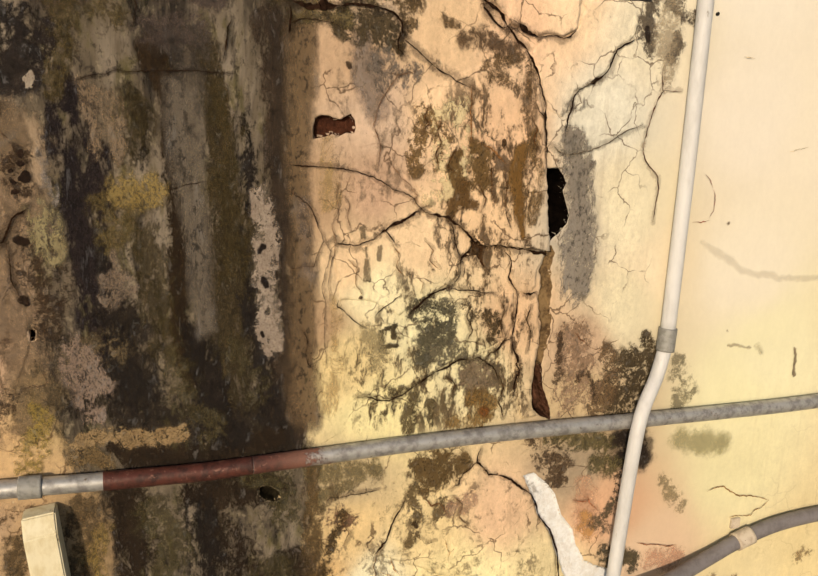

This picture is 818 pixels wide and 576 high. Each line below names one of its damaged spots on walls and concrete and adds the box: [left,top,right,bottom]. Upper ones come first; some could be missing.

flaking render [22,70,34,88]
spalling [313,114,356,139]
crack [483,0,680,218]
leakage [0,0,426,474]
crack [289,0,551,416]
flaking render [408,168,569,419]
spalling [58,333,190,471]
leakage [552,321,657,417]
leakage [61,458,383,576]
crack [373,449,559,576]
leakage [524,429,630,569]
crack [707,486,769,518]